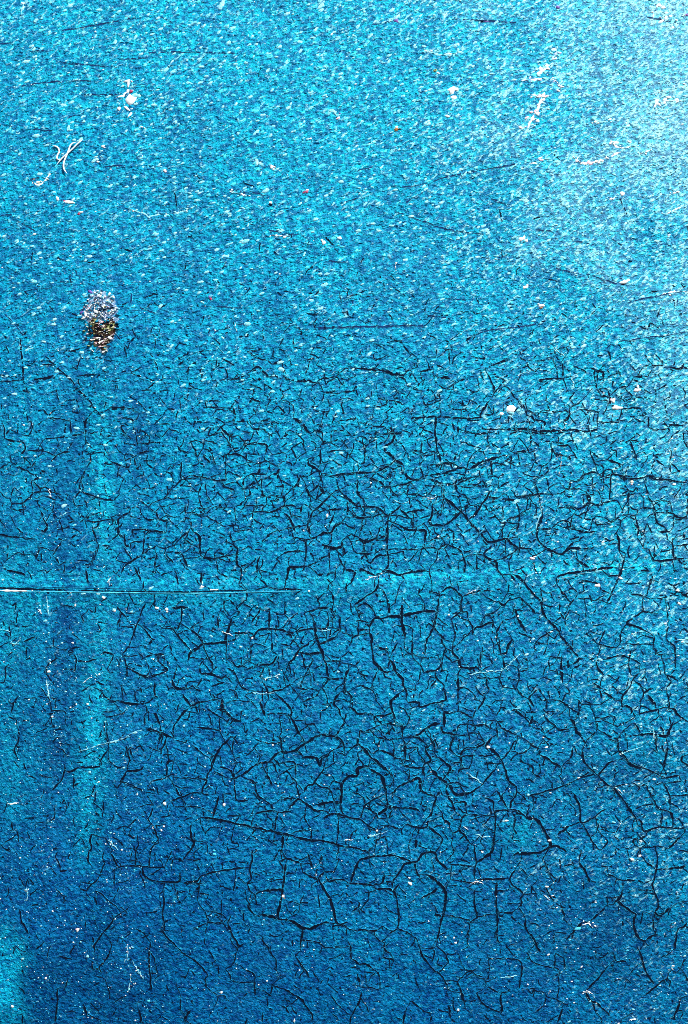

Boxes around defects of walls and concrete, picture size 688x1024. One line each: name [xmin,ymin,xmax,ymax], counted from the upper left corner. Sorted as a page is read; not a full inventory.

crack [229,181,266,196]
peeling [78,288,120,354]
crack [0,214,688,1024]